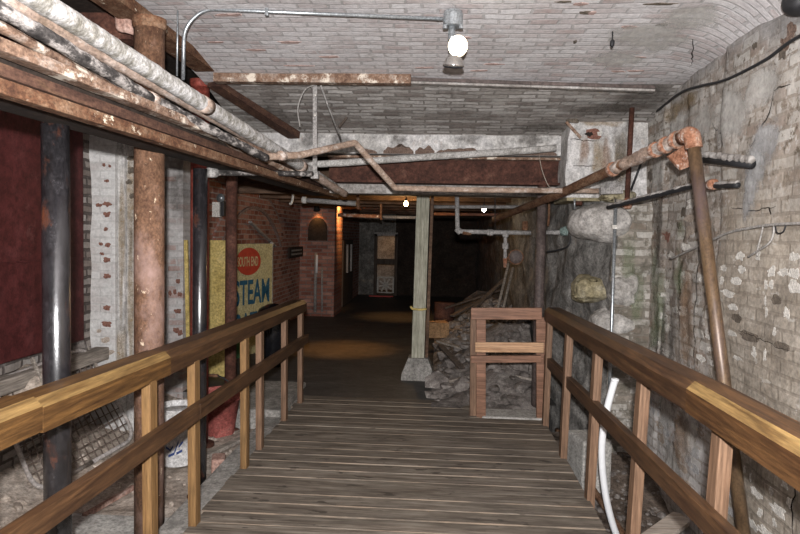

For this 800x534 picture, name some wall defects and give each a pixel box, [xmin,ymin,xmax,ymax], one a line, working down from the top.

crack [750,84,790,147]
spalling [365,144,476,154]